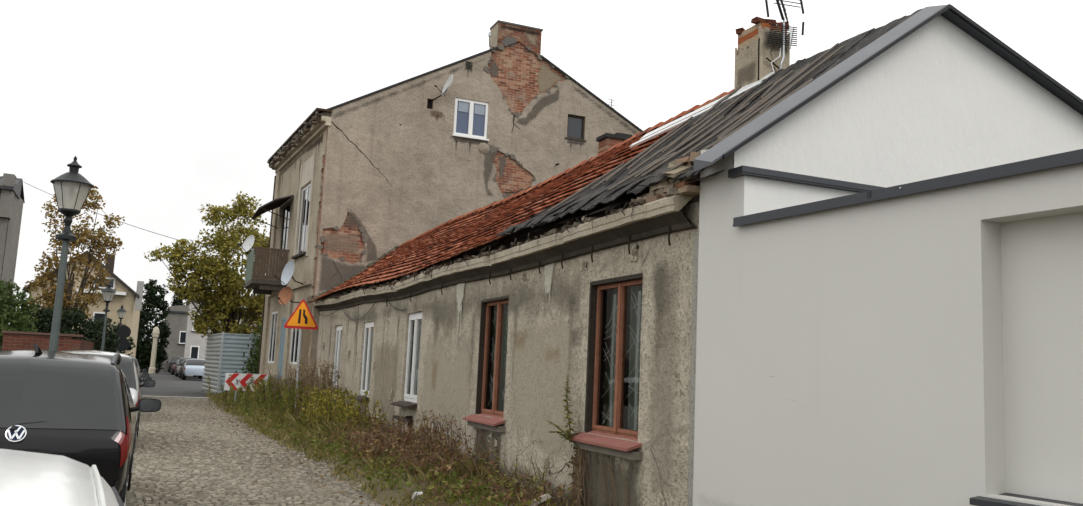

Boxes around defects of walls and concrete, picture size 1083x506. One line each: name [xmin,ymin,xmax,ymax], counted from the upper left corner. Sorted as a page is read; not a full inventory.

flaking render [483,42,570,125]
crack [332,122,391,185]
flaking render [484,146,536,198]
spalling [639,151,701,203]
flaking render [306,155,376,314]